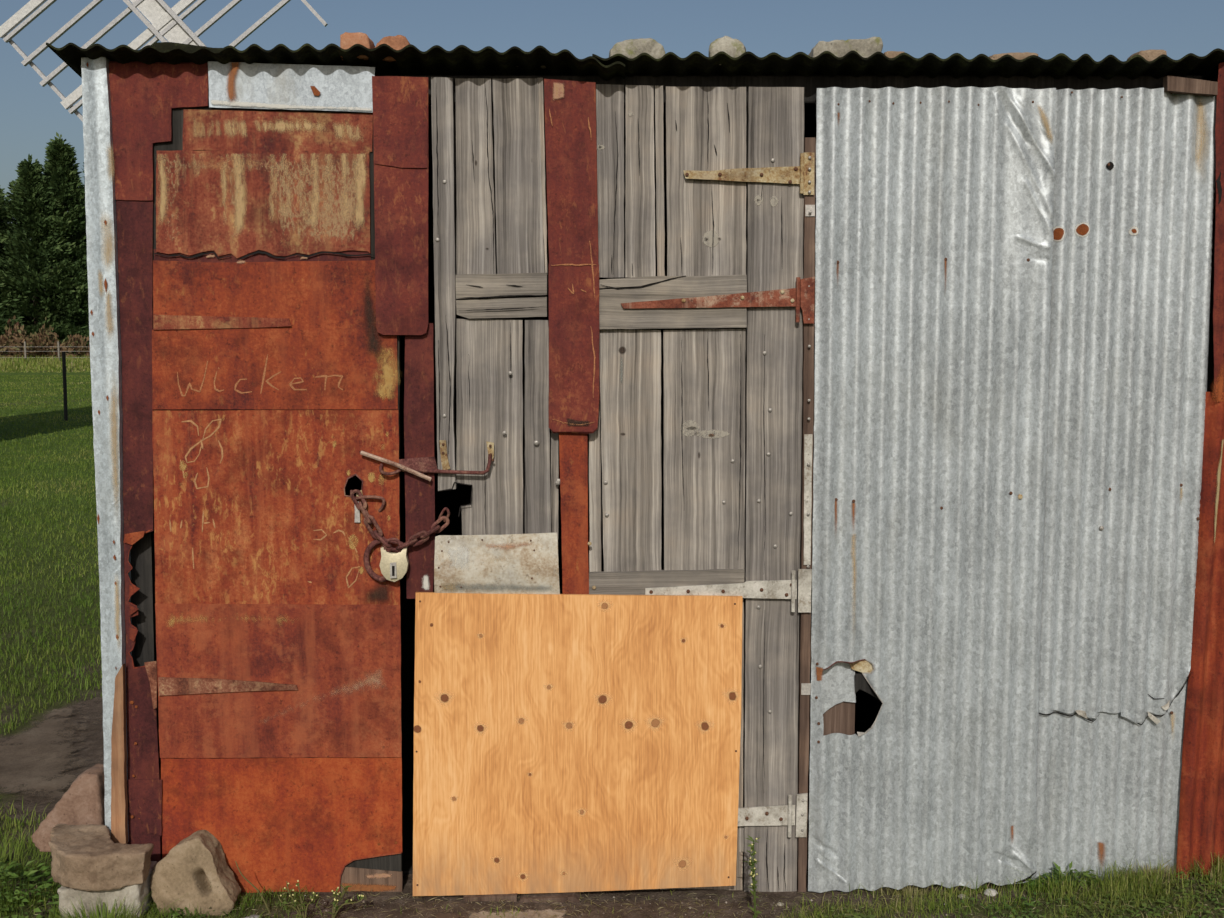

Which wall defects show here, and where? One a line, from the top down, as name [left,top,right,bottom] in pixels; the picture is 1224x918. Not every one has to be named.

corrosion [549,83,564,126]
corrosion [1053,222,1090,241]
corrosion [552,241,596,295]
corrosion [366,296,379,354]
corrosion [90,200,375,780]
corrosion [1171,63,1224,879]
crack [1039,712,1099,722]
crack [1137,672,1192,725]
corrosion [127,801,161,862]